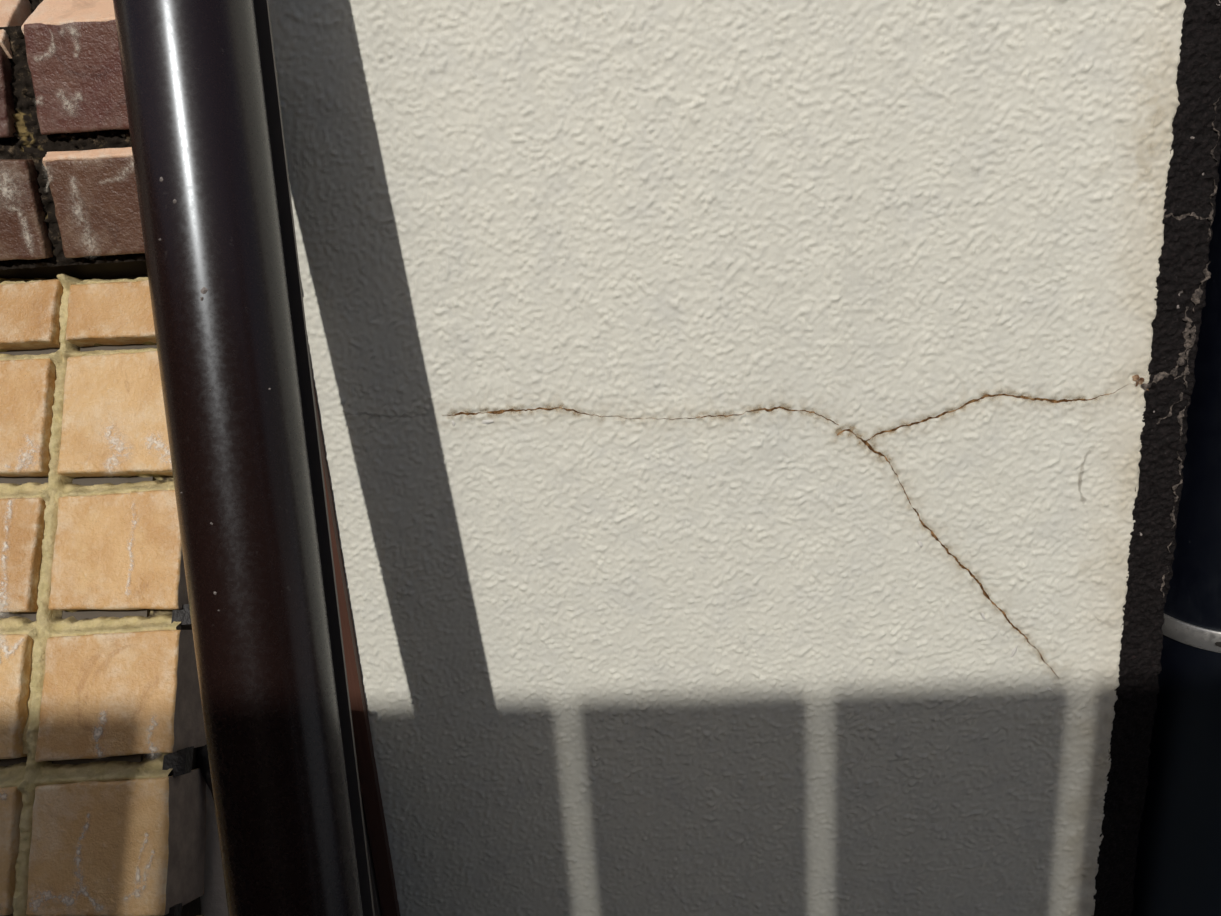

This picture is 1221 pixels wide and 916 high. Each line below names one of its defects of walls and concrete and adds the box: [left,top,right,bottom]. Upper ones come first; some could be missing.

leakage [0,500,11,609]
crack [448,387,1123,692]